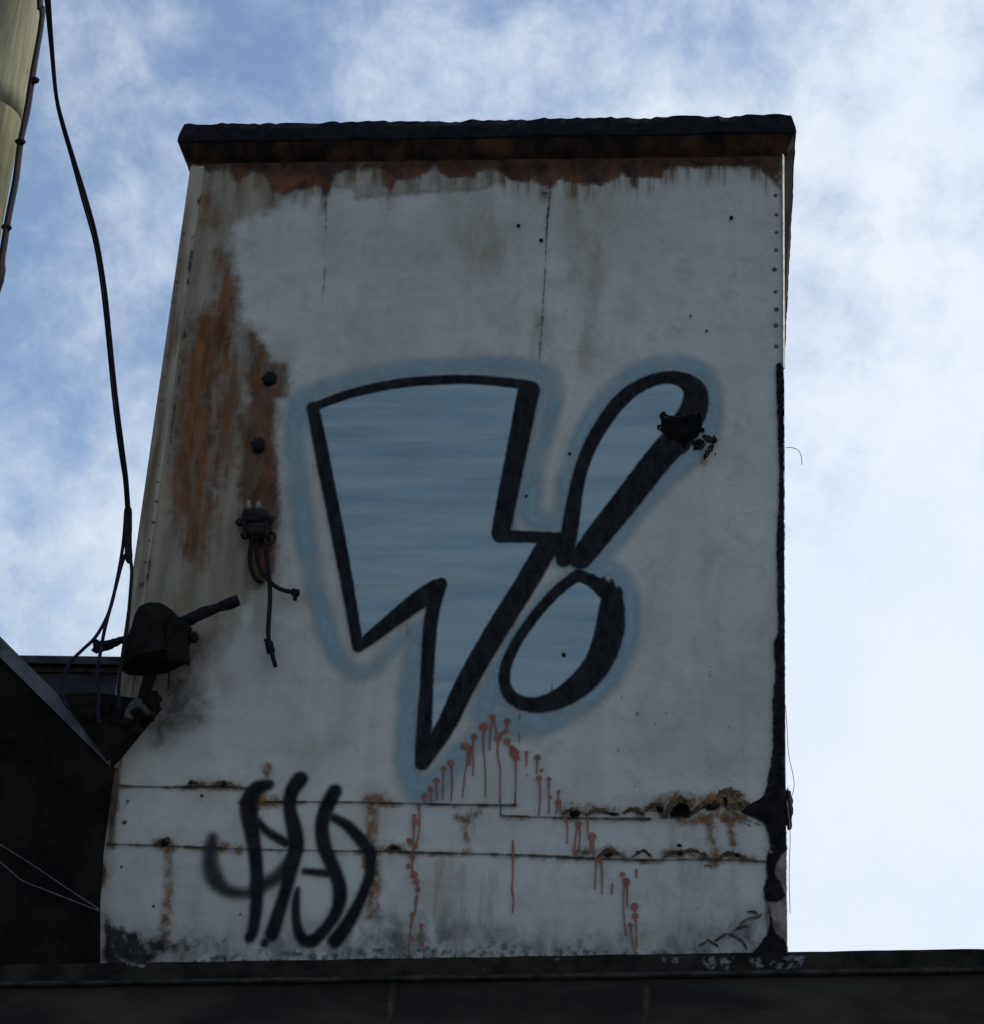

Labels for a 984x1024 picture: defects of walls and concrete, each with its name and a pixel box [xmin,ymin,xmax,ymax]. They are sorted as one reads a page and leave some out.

corrosion [197,156,781,203]
corrosion [173,255,286,581]
peeling [694,434,717,458]
corrosion [152,840,173,942]
corrosion [357,794,409,918]
corrosion [656,792,755,867]
damp [103,919,189,963]